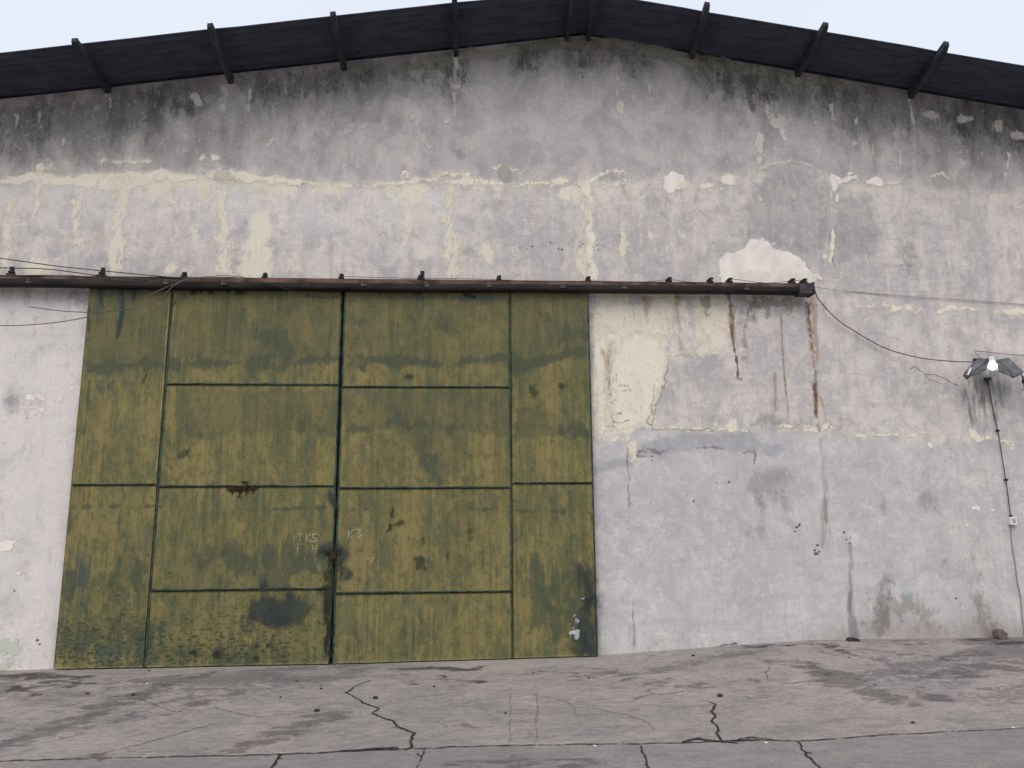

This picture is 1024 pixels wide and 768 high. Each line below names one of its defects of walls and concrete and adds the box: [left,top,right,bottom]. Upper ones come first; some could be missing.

water stain [189,92,203,108]
water stain [348,37,848,124]
water stain [754,104,788,165]
water stain [991,120,1024,140]
peeling [663,171,735,193]
peeling [828,172,899,202]
peeling [719,237,823,283]
peeling [591,297,748,463]
corrosion [729,304,742,379]
corrosion [805,302,820,431]
corrosion [227,480,258,498]
crack [3,680,1013,768]